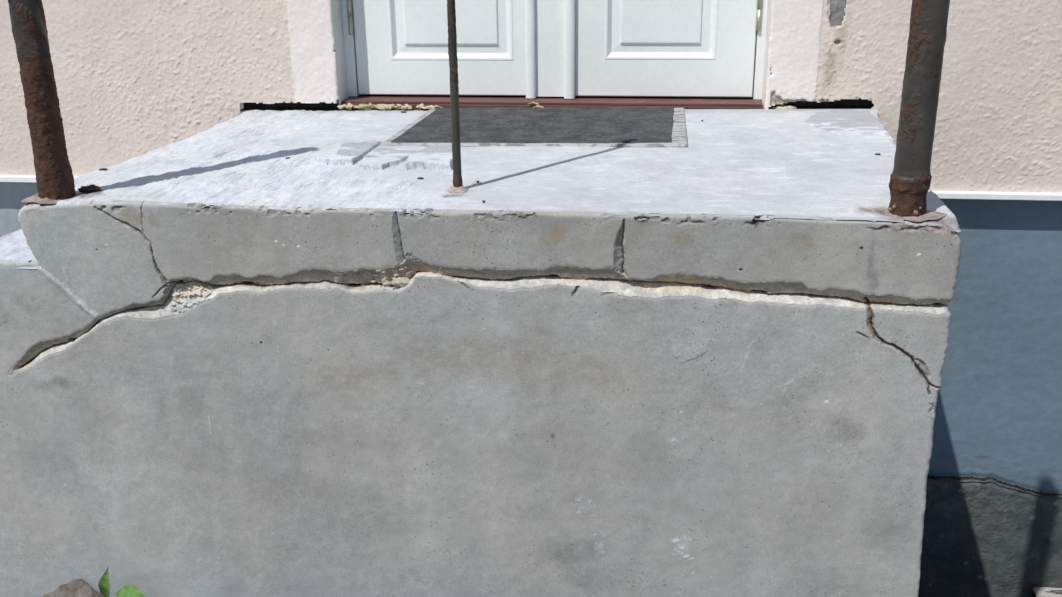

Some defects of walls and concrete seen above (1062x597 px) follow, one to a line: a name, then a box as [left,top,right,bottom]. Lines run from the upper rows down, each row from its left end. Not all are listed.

peeling [829,0,847,27]
crack [9,201,952,396]